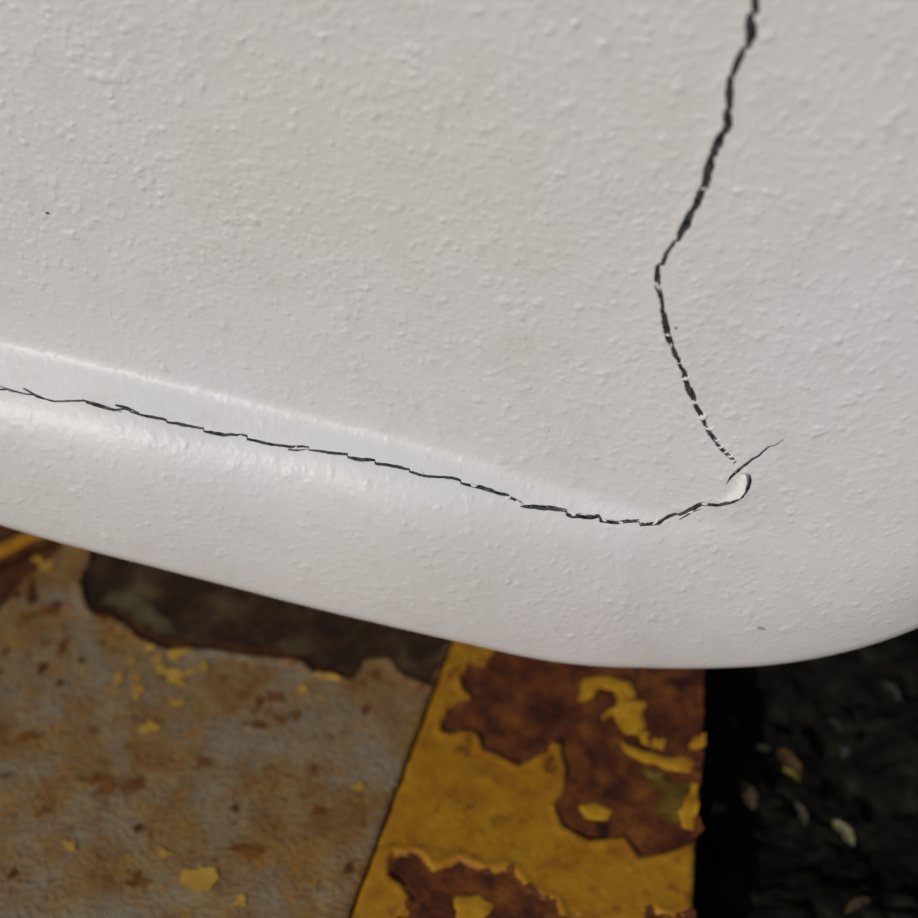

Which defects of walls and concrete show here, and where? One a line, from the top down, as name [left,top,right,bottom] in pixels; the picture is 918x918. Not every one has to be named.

crack [0,0,783,526]
corrosion [0,545,61,627]
corrosion [237,692,301,728]
peeling [441,651,706,856]
peeling [387,852,568,918]
peeling [645,905,697,918]